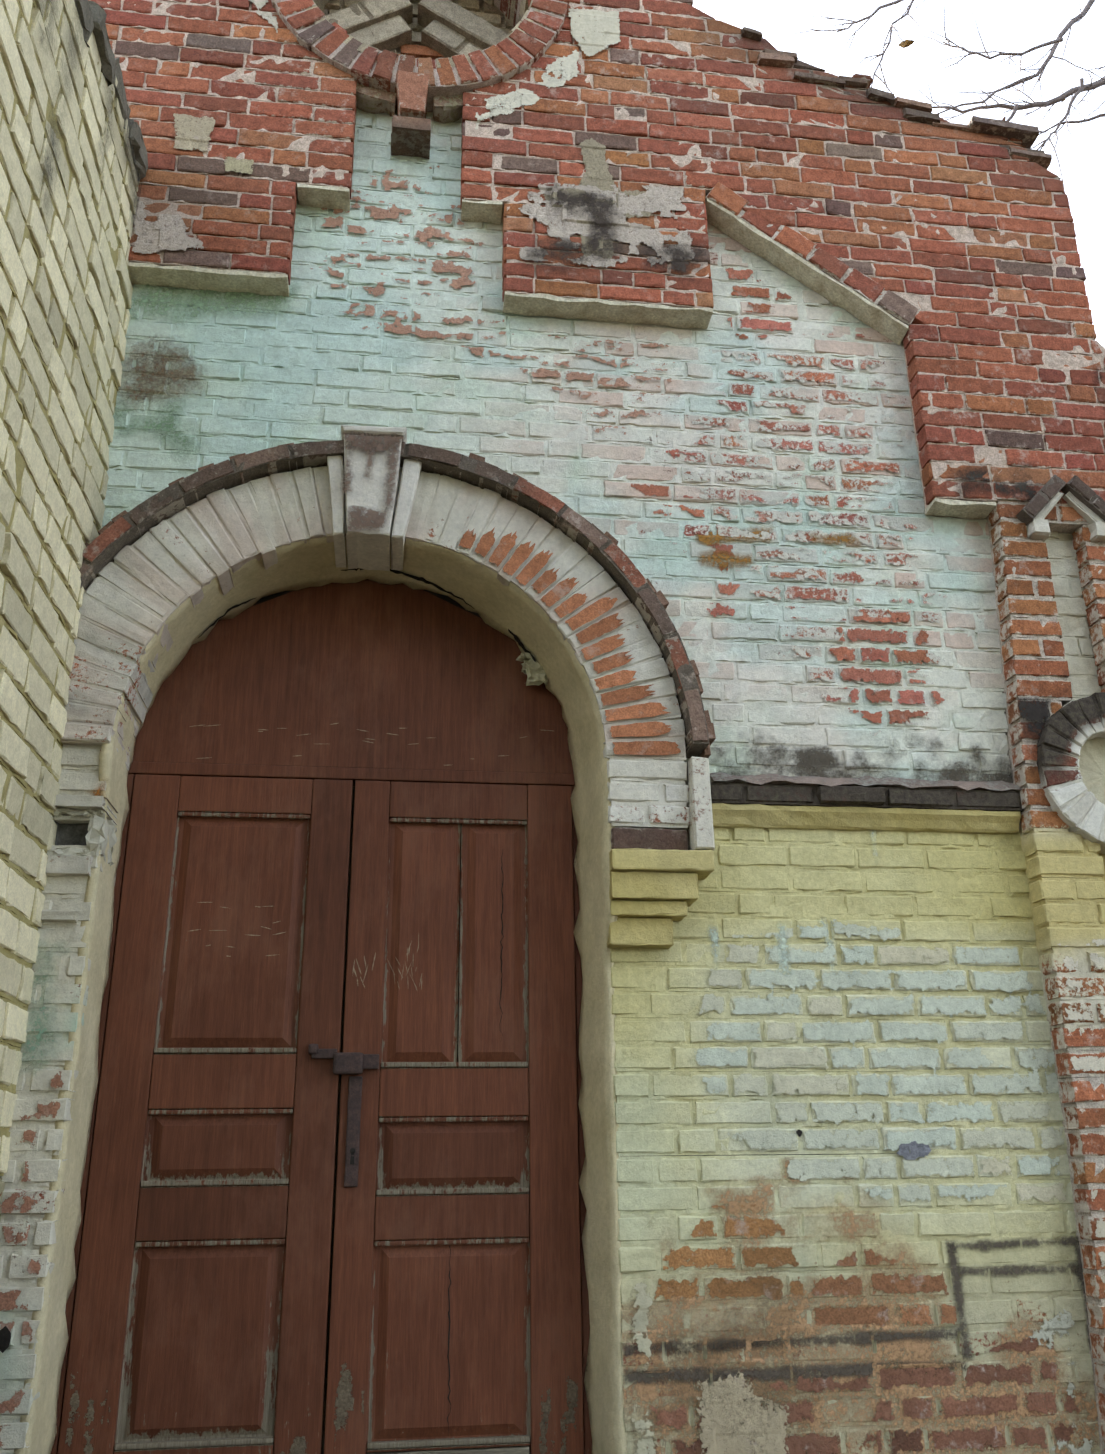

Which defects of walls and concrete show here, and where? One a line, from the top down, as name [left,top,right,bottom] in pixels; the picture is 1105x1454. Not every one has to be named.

water stain [120,346,195,402]
peeling [311,169,680,439]
peeling [631,268,947,736]
water stain [79,432,893,778]
peeling [458,527,681,755]
spalling [690,660,716,758]
water stain [916,746,1014,783]
peeling [0,1071,64,1243]
crack [0,1326,11,1353]
peeling [0,1290,33,1344]
peeling [632,1204,957,1371]
peeling [631,1309,1093,1454]